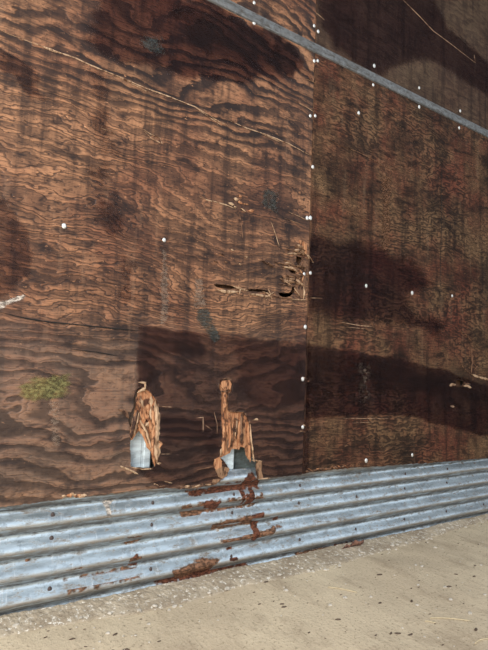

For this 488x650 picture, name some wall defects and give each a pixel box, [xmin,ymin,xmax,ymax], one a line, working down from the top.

crack [1,312,138,331]
crack [214,284,322,301]
spalling [118,382,163,474]
hole [198,378,269,485]
rust [179,472,281,550]
rust [154,557,248,584]